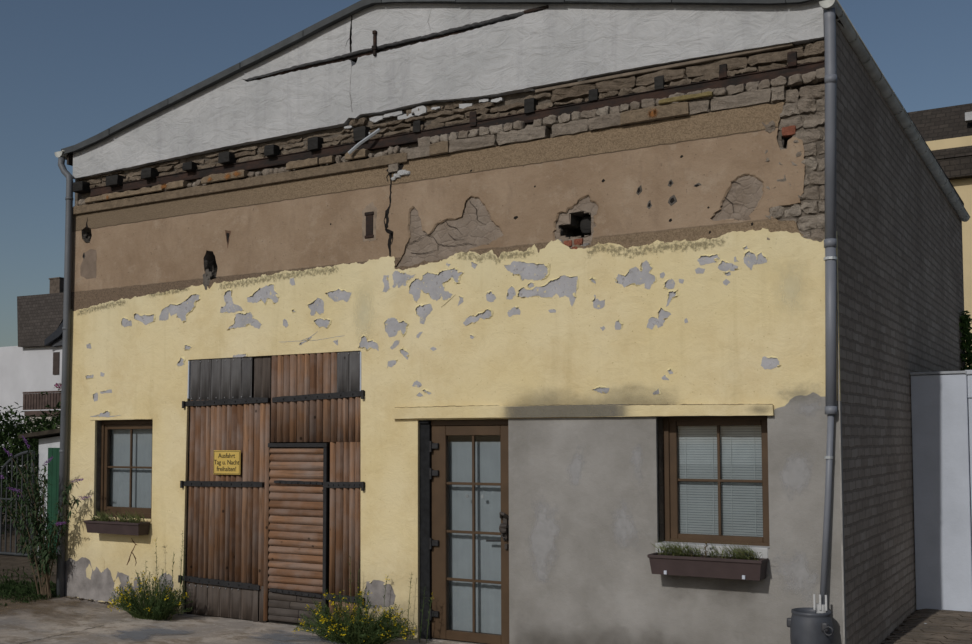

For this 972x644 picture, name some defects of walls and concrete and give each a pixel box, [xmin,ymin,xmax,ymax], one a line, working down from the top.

crack [345,16,353,53]
crack [384,169,393,256]
spalling [552,195,599,249]
spalling [707,173,764,234]
peeling [121,251,218,327]
peeling [220,283,279,330]
peeling [299,288,351,345]
spalling [358,195,503,367]
peeling [463,261,605,339]
peeling [614,260,684,329]
peeling [695,245,768,286]
peeling [64,557,141,602]